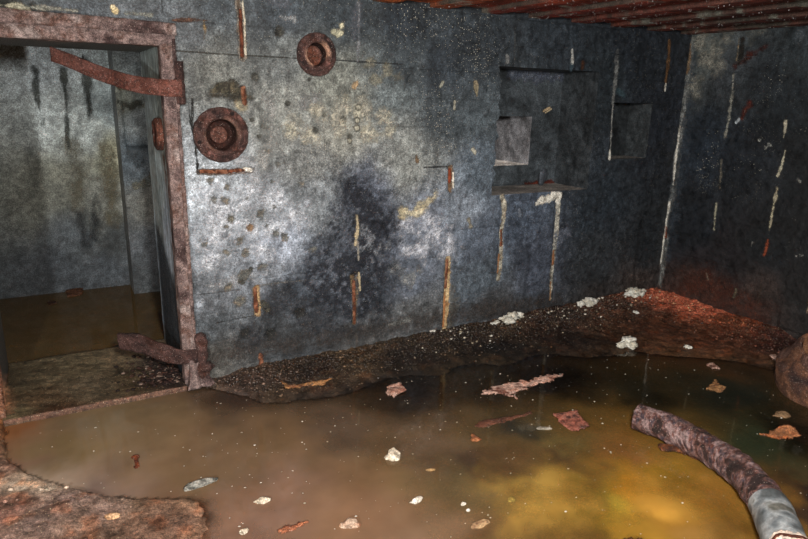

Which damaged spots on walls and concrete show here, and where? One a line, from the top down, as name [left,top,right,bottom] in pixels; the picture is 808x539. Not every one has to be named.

water stain [724,74,734,138]
water stain [659,33,728,286]
efflorescence [397,191,455,258]
water stain [207,282,560,365]
rust [442,256,459,329]